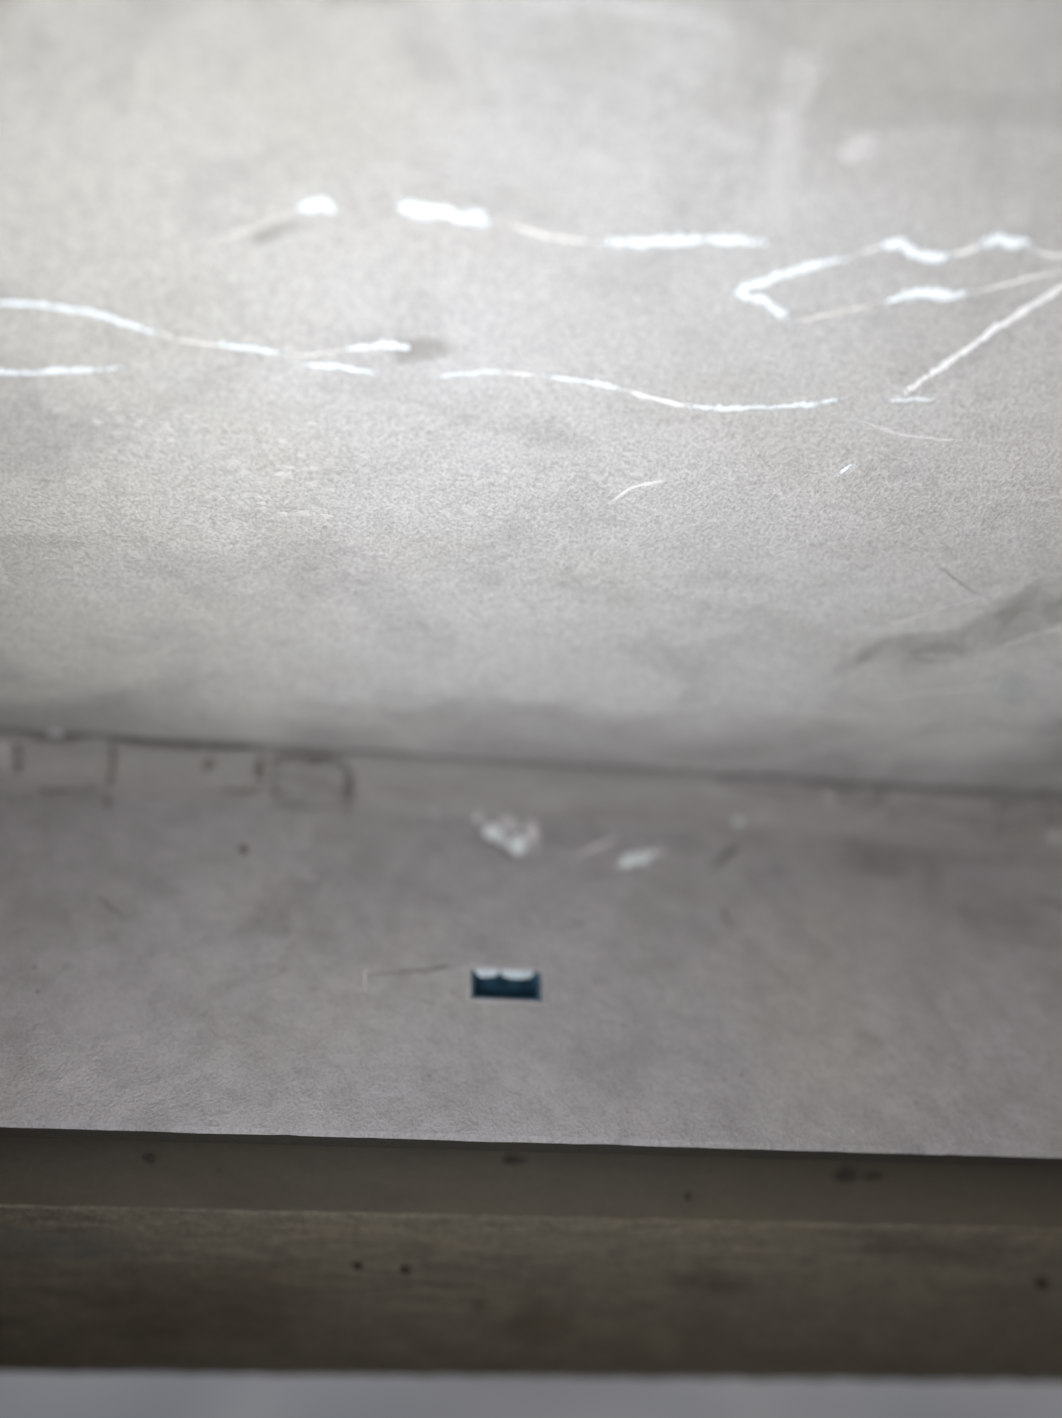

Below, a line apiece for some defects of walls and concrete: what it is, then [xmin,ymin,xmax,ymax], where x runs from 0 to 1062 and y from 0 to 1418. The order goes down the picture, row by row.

crack [208,195,337,243]
crack [397,196,1062,402]
crack [0,297,410,374]
crack [0,365,124,376]
crack [438,368,838,412]